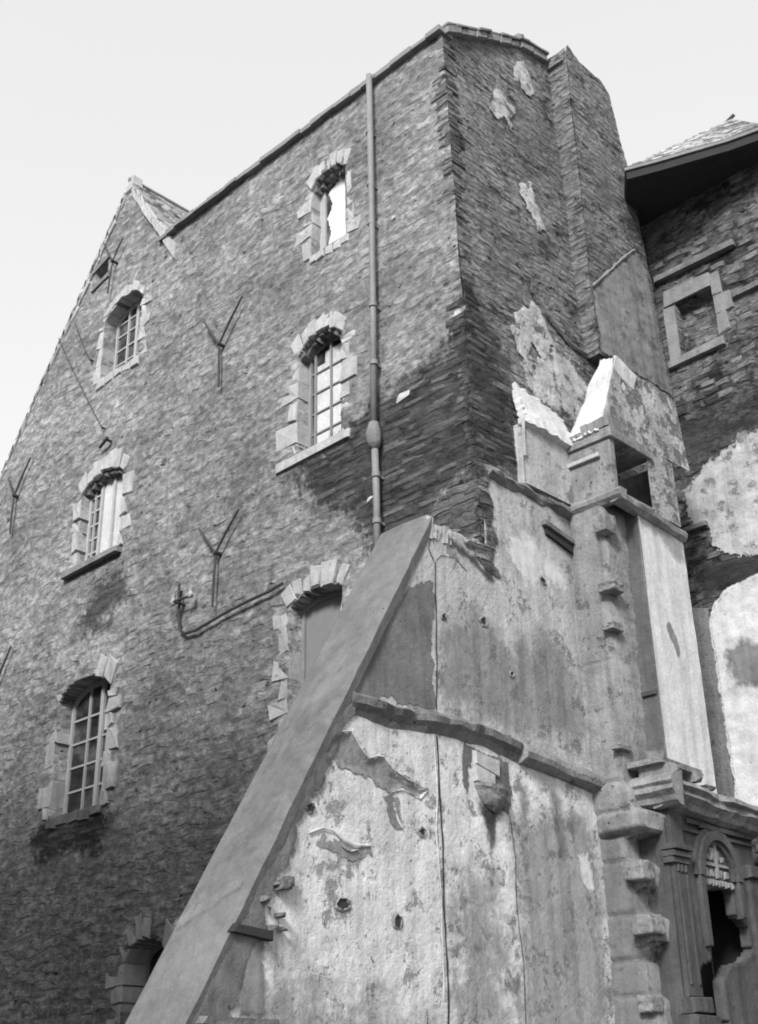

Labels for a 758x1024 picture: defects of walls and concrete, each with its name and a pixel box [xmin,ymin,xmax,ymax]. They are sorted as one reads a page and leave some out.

flaking render [429,460,501,578]
damp [356,580,436,710]
damp [726,639,758,686]
flaking render [192,701,428,1024]
crack [428,539,467,1024]
damp [486,814,496,847]
crack [510,818,527,1024]
damp [577,852,595,892]